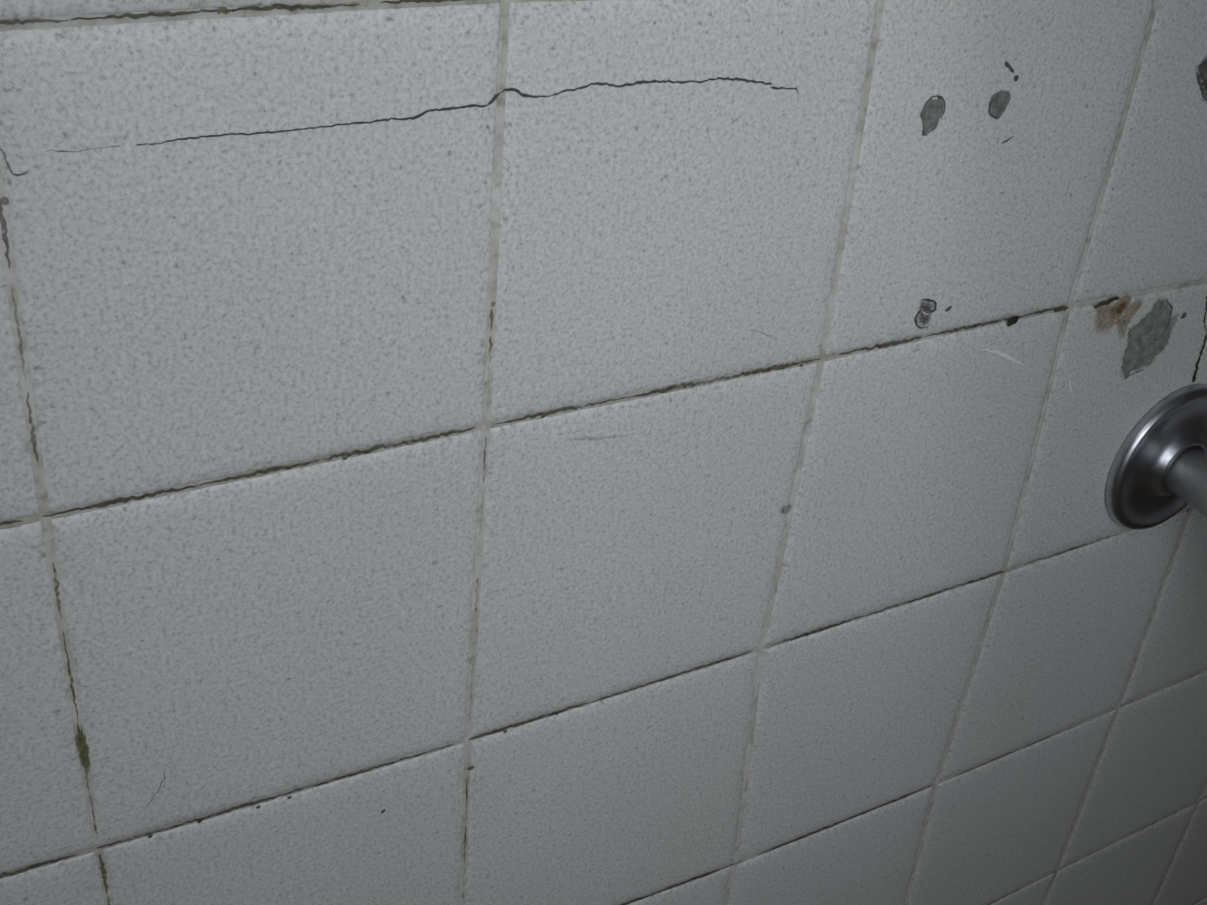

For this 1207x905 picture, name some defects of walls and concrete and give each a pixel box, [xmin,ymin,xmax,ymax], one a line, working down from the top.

crack [111,77,798,147]
peeling [920,95,946,136]
peeling [988,61,1019,119]
spalling [1197,59,1207,101]
crack [0,148,27,176]
spalling [1121,299,1187,379]
crack [1192,296,1207,382]